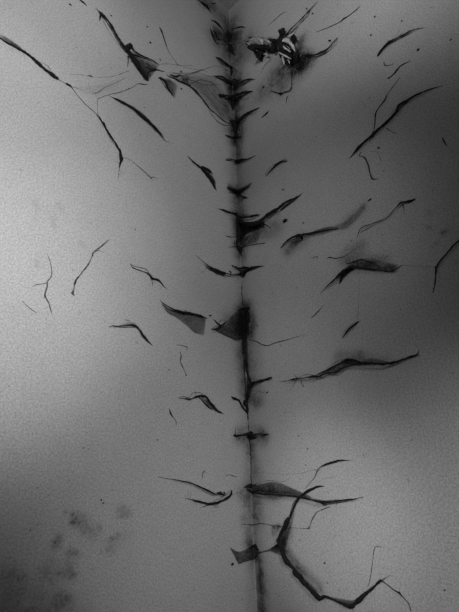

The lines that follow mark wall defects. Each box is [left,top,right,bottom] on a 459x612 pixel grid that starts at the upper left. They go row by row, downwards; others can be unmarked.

crack [71,241,108,295]